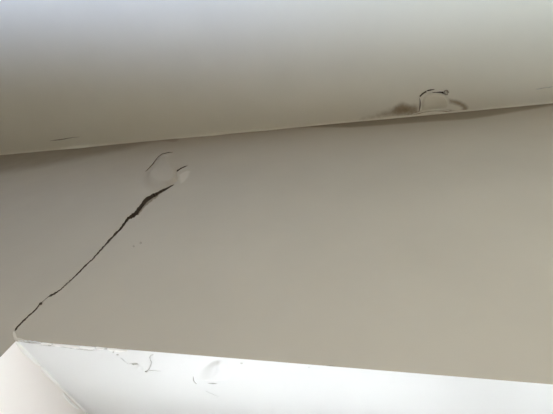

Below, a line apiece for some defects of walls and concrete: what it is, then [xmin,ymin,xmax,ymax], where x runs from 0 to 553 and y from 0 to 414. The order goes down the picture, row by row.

leakage [285,94,553,130]
crack [15,185,173,331]